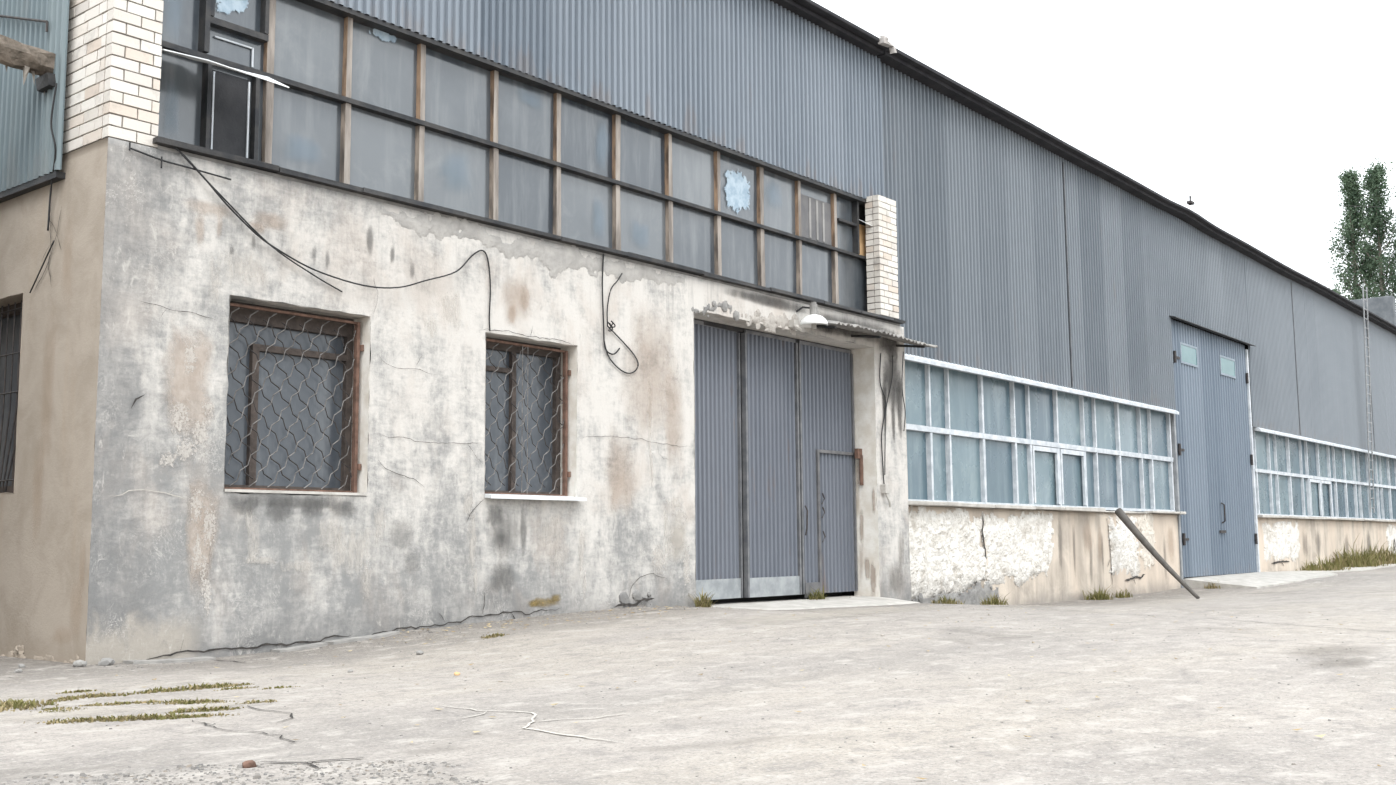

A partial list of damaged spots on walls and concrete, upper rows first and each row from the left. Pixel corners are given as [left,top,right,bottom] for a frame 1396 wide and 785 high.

flaking render [378,208,685,286]
spalling [691,300,799,335]
spalling [909,506,1054,605]
spalling [1107,513,1156,577]
spalling [1262,521,1300,563]
crack [146,592,559,660]